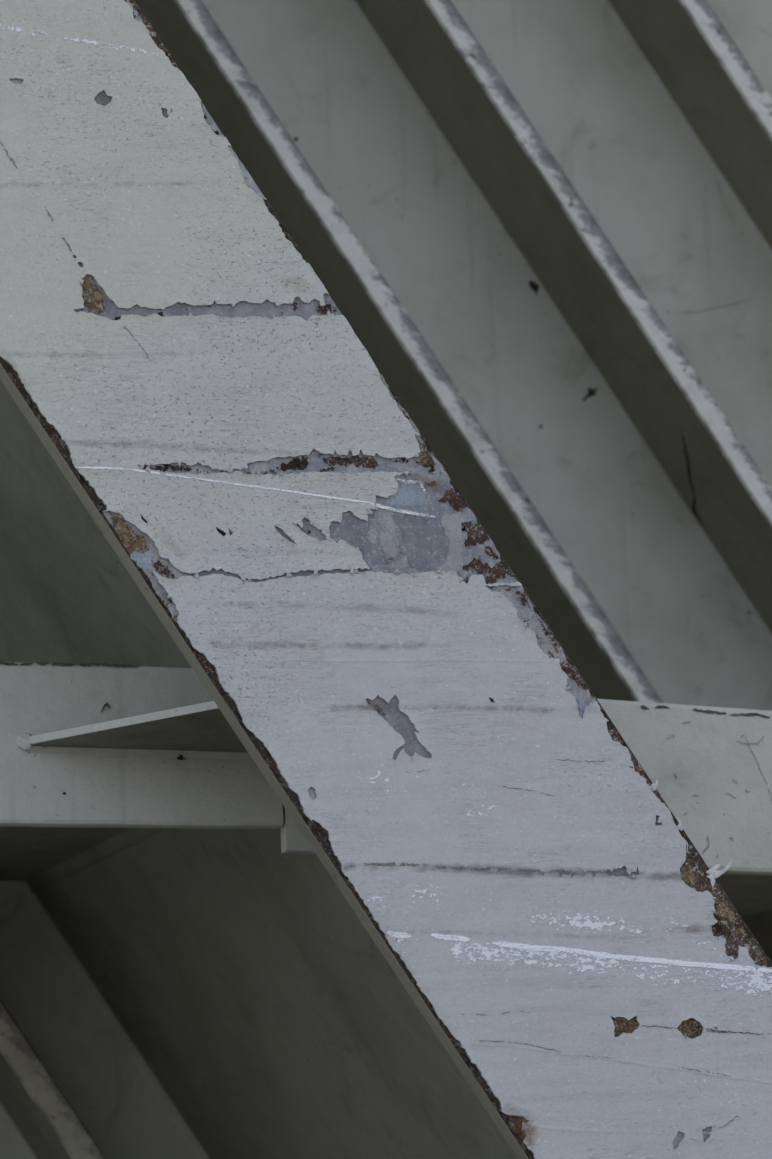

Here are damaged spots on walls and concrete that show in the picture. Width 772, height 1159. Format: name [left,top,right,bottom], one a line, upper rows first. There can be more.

rust [124,0,180,70]
peeling [74,275,342,320]
peeling [138,432,517,584]
peeling [103,511,182,622]
peeling [366,696,431,760]
rust [680,845,772,988]
water stain [431,933,772,997]
rust [611,1016,638,1037]
rust [677,1018,703,1039]